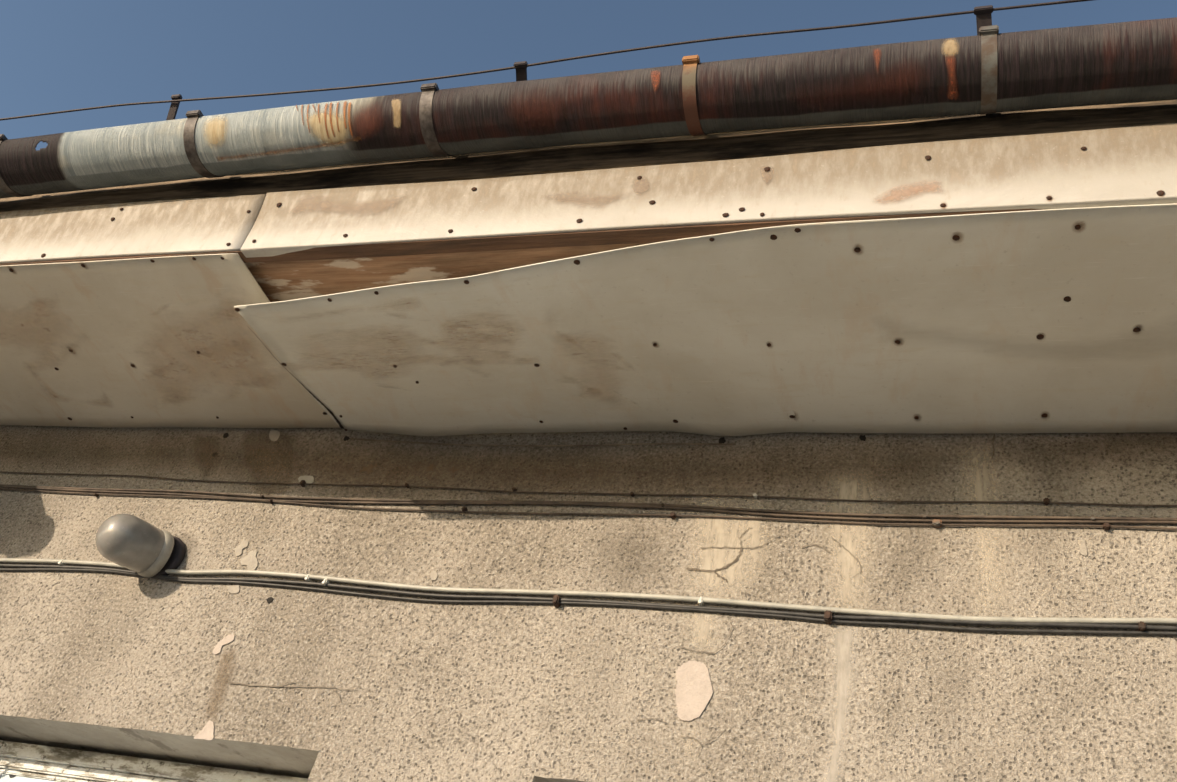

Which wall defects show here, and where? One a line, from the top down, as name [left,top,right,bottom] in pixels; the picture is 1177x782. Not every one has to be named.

crack [686,527,862,582]
flaking render [675,660,713,722]